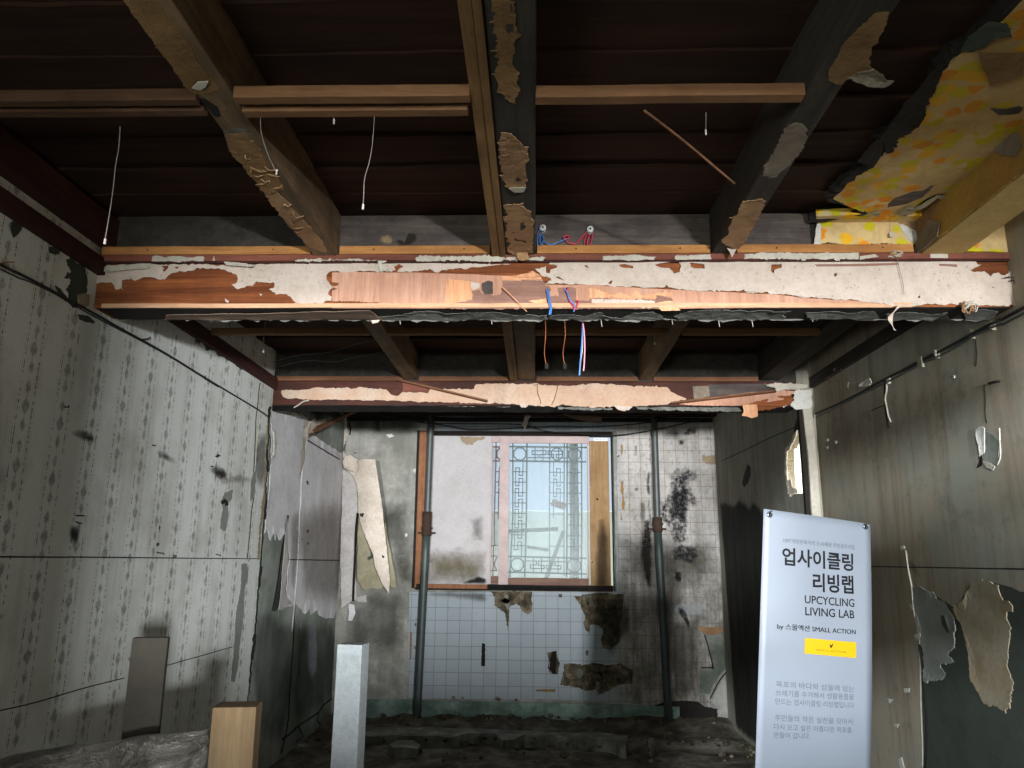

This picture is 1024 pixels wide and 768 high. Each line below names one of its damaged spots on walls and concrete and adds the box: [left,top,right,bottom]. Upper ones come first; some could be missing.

peeling [245,155,283,189]
peeling [48,247,1009,385]
flaking render [982,431,1000,467]
mould [641,470,697,584]
spalling [490,591,532,631]
spalling [547,650,633,695]
spalling [559,592,624,650]
peeling [909,579,1014,713]